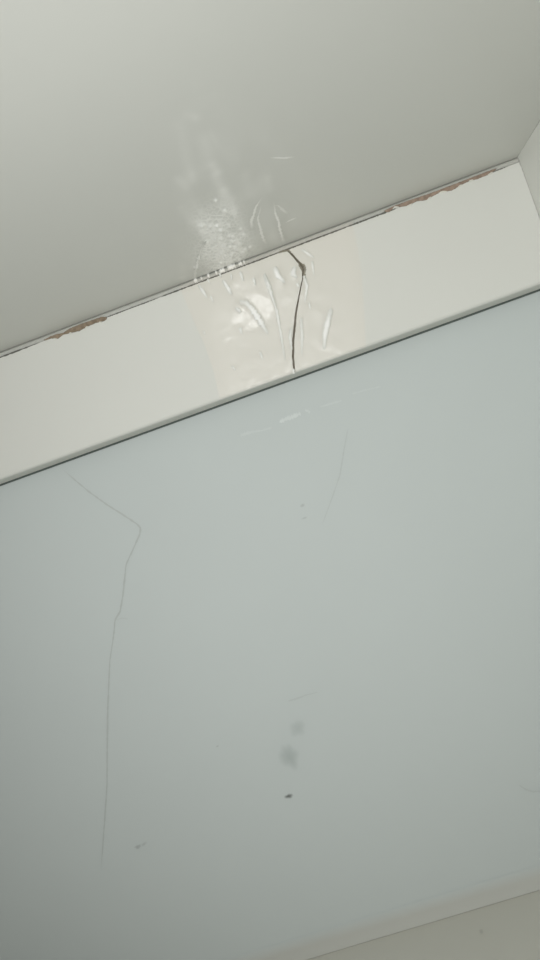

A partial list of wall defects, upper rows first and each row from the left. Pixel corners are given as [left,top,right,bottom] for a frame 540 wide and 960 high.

peeling [385,169,496,212]
peeling [44,317,107,340]
crack [108,209,395,369]
crack [62,469,142,870]